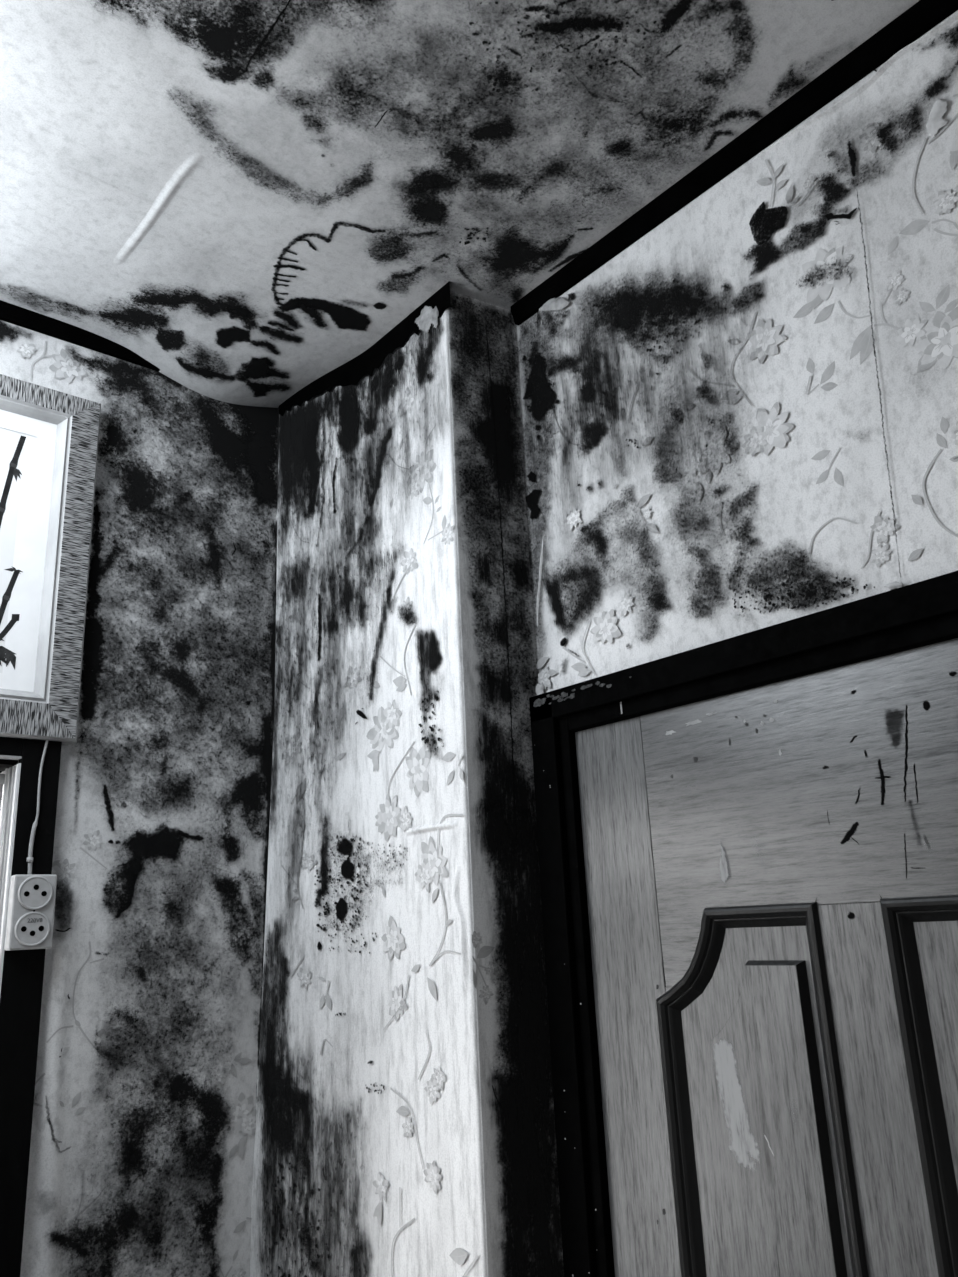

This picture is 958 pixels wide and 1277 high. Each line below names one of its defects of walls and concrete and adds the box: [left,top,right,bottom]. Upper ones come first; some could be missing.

leakage [0,0,763,397]
leakage [769,67,809,107]
leakage [796,259,852,287]
leakage [805,24,958,226]
leakage [50,317,444,1277]
leakage [449,273,875,1277]